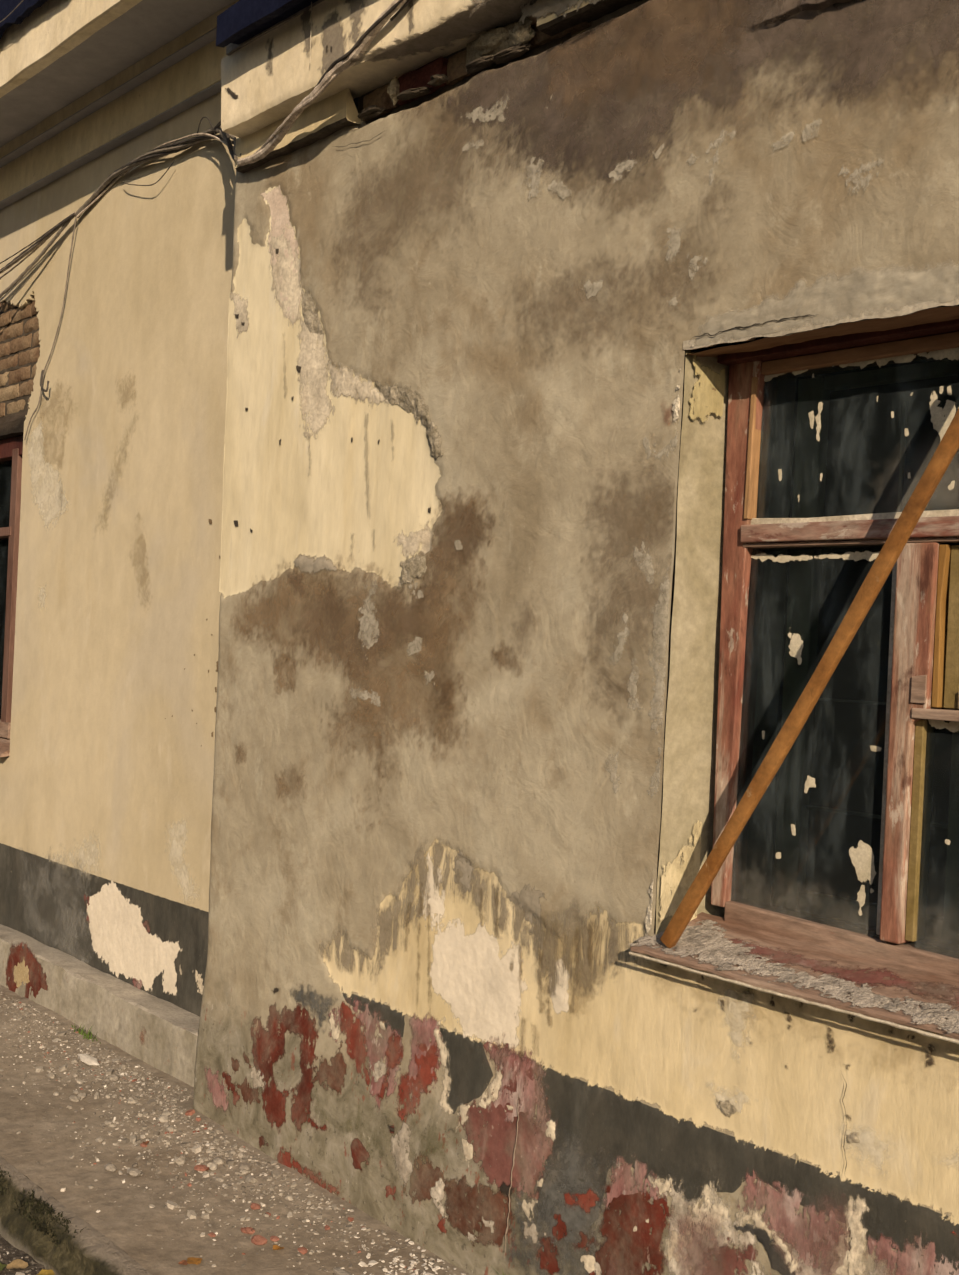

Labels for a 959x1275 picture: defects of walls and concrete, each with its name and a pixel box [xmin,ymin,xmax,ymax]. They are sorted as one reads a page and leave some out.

leakage [301,0,537,74]
flaking render [357,0,604,125]
leakage [337,0,959,299]
flaking render [0,295,40,418]
flaking render [209,185,444,599]
peeling [666,345,725,422]
leakage [235,497,483,777]
peeling [84,880,204,995]
peeling [0,942,49,1065]
flaking render [199,820,959,1275]